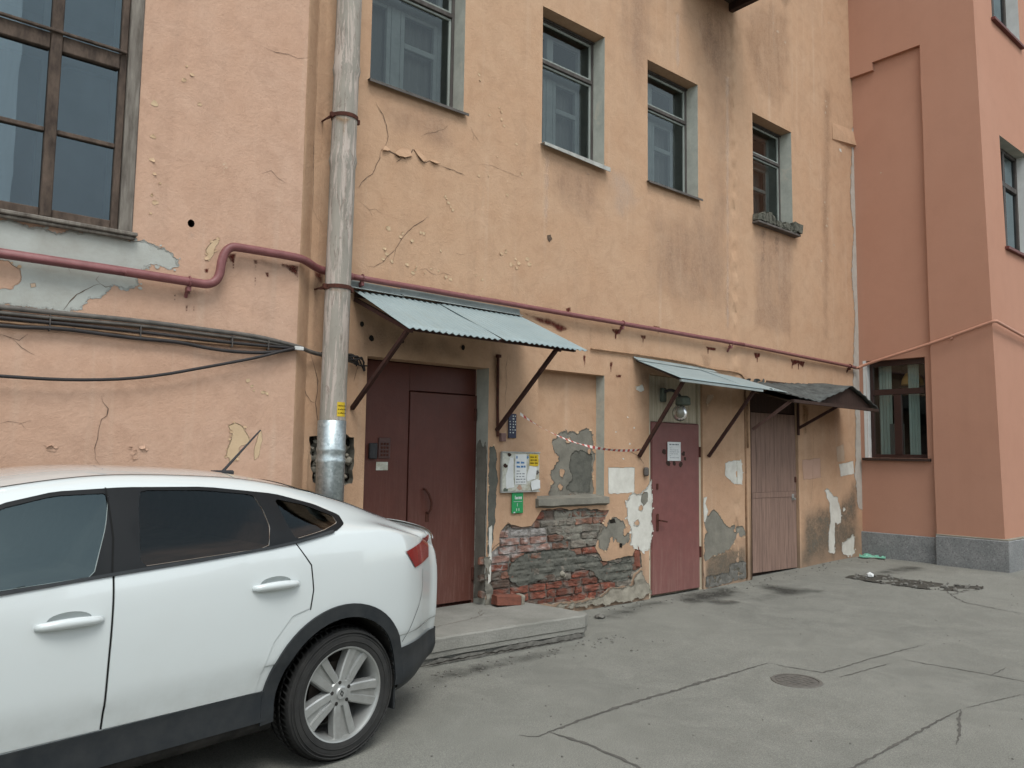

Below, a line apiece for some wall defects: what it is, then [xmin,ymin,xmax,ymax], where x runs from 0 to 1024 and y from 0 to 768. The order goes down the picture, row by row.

crack [360,107,527,215]
peeling [0,219,181,312]
corrosion [535,318,566,332]
peeling [224,421,263,462]
peeling [548,428,596,496]
flaking render [474,440,654,609]
peeling [703,497,746,561]
damp [806,494,855,556]
peeling [825,488,856,557]